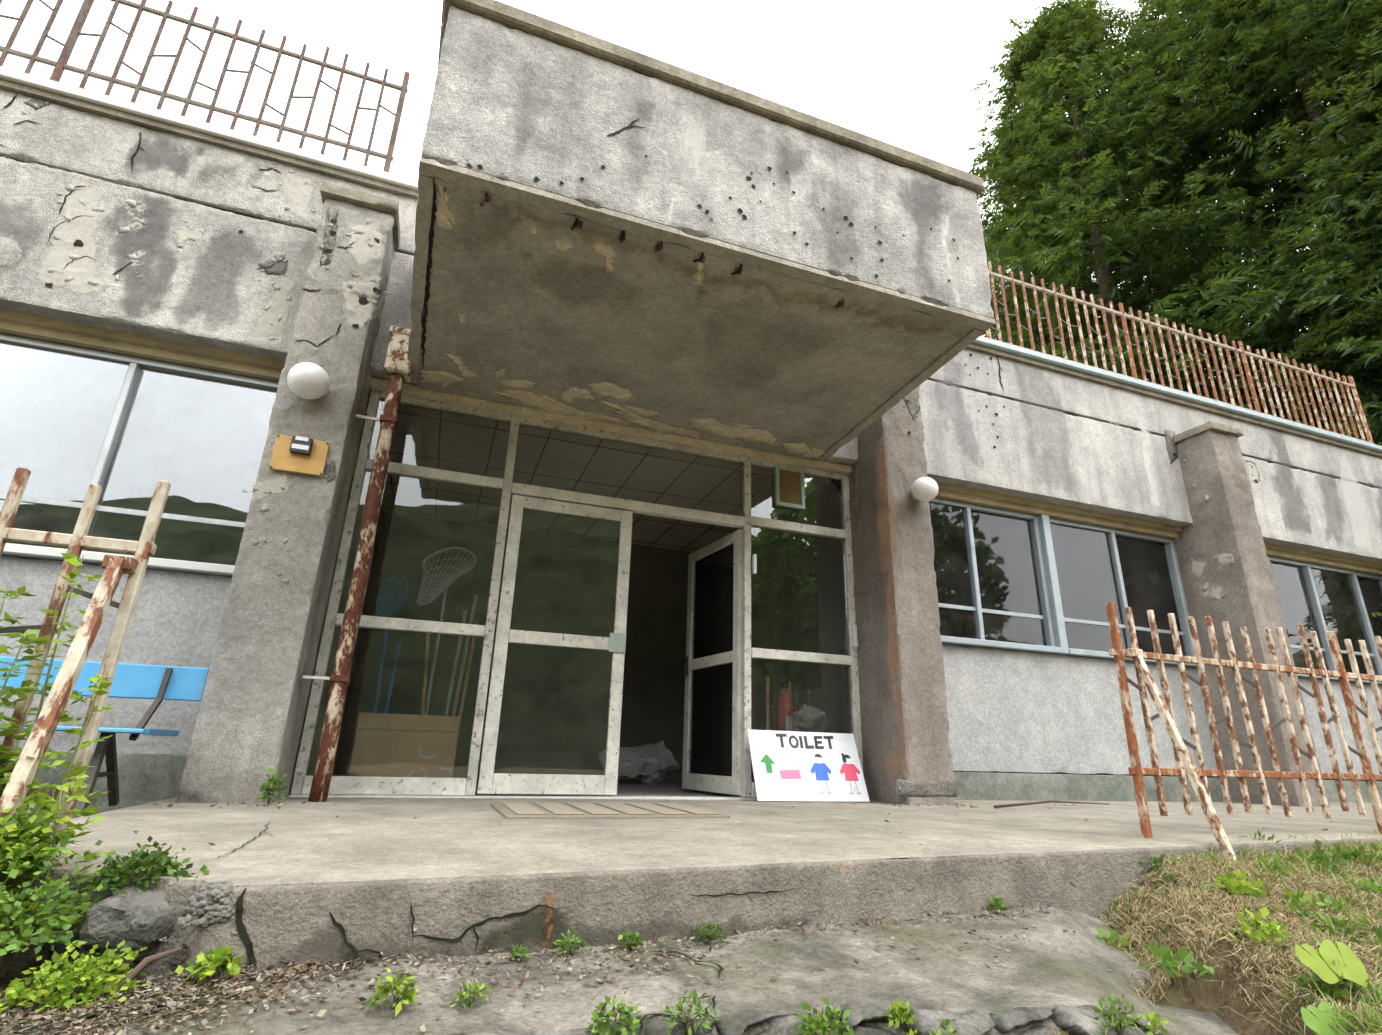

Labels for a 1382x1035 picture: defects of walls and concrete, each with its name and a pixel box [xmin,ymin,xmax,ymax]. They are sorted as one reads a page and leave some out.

leakage [128,137,202,174]
flaking render [39,180,147,293]
leakage [114,198,175,315]
flaking render [176,221,203,248]
flaking render [251,161,391,328]
crack [421,184,437,371]
peeling [418,353,843,464]
crack [329,912,382,965]
crack [408,903,555,951]